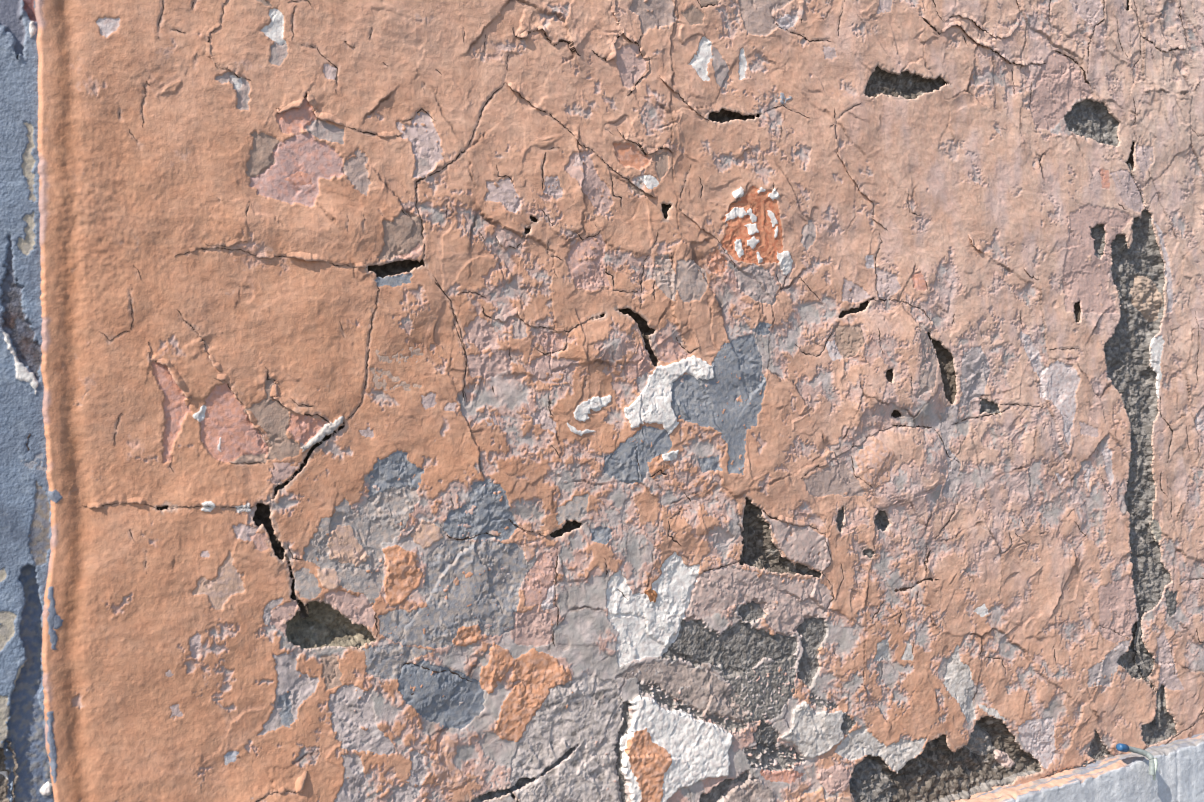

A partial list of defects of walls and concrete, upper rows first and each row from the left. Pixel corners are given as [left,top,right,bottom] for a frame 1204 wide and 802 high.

crack [922,0,1051,108]
flaking render [0,122,42,394]
flaking render [0,453,54,802]
crack [84,206,380,566]
crack [279,547,309,619]
peeling [258,651,470,802]
crack [471,744,578,802]
crack [347,32,735,400]
peeling [652,186,793,305]
peeling [510,508,1114,802]
crack [872,502,958,653]
flaking render [1020,142,1184,746]